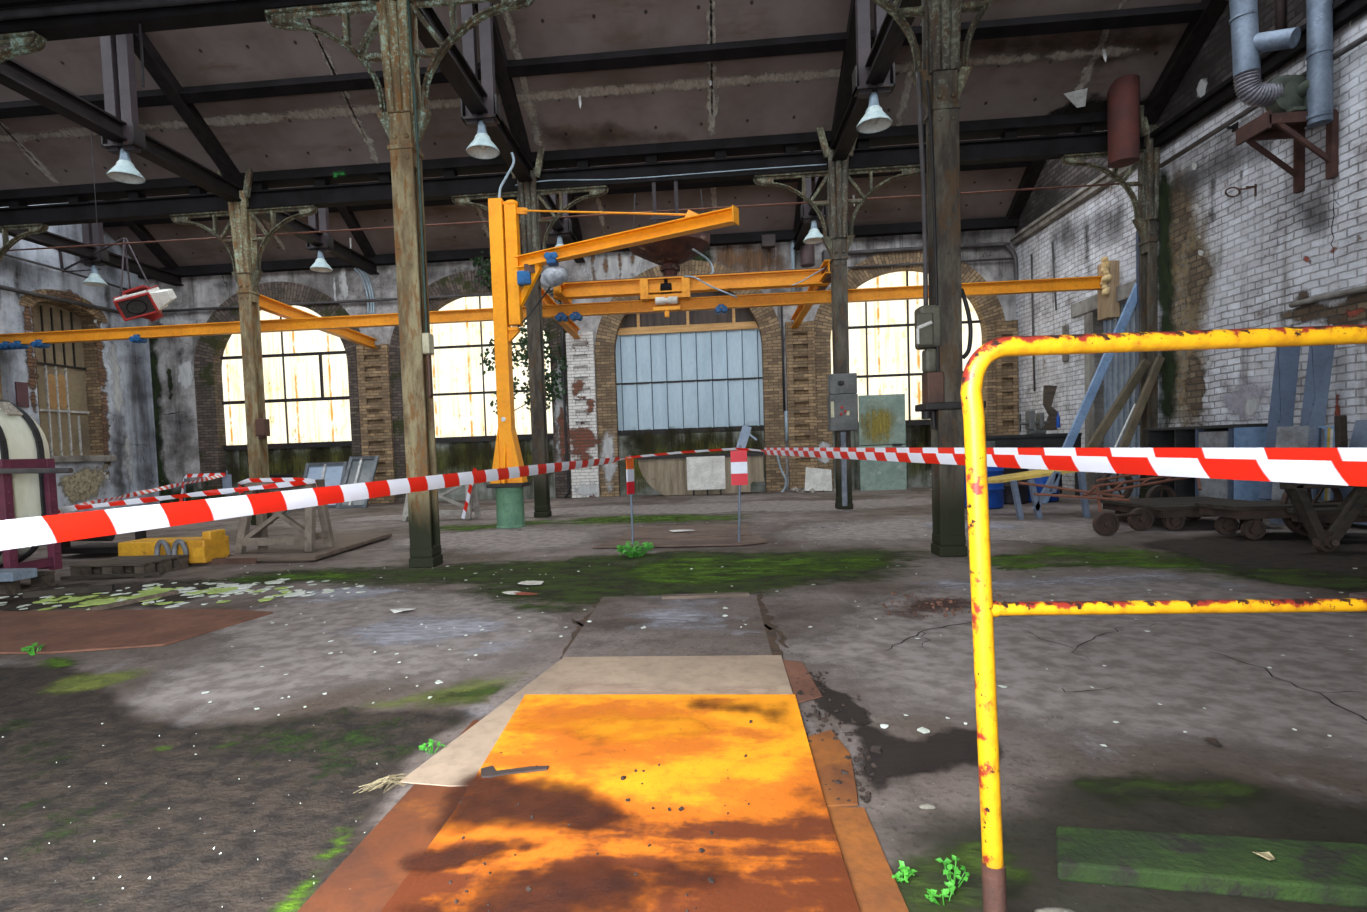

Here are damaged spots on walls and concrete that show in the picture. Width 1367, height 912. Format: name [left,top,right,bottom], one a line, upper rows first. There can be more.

peeling [1169,163,1219,331]
spalling [1277,291,1367,327]
leakage [133,356,146,440]
leakage [114,433,171,503]
peeling [554,360,616,496]
peeling [1173,350,1213,425]